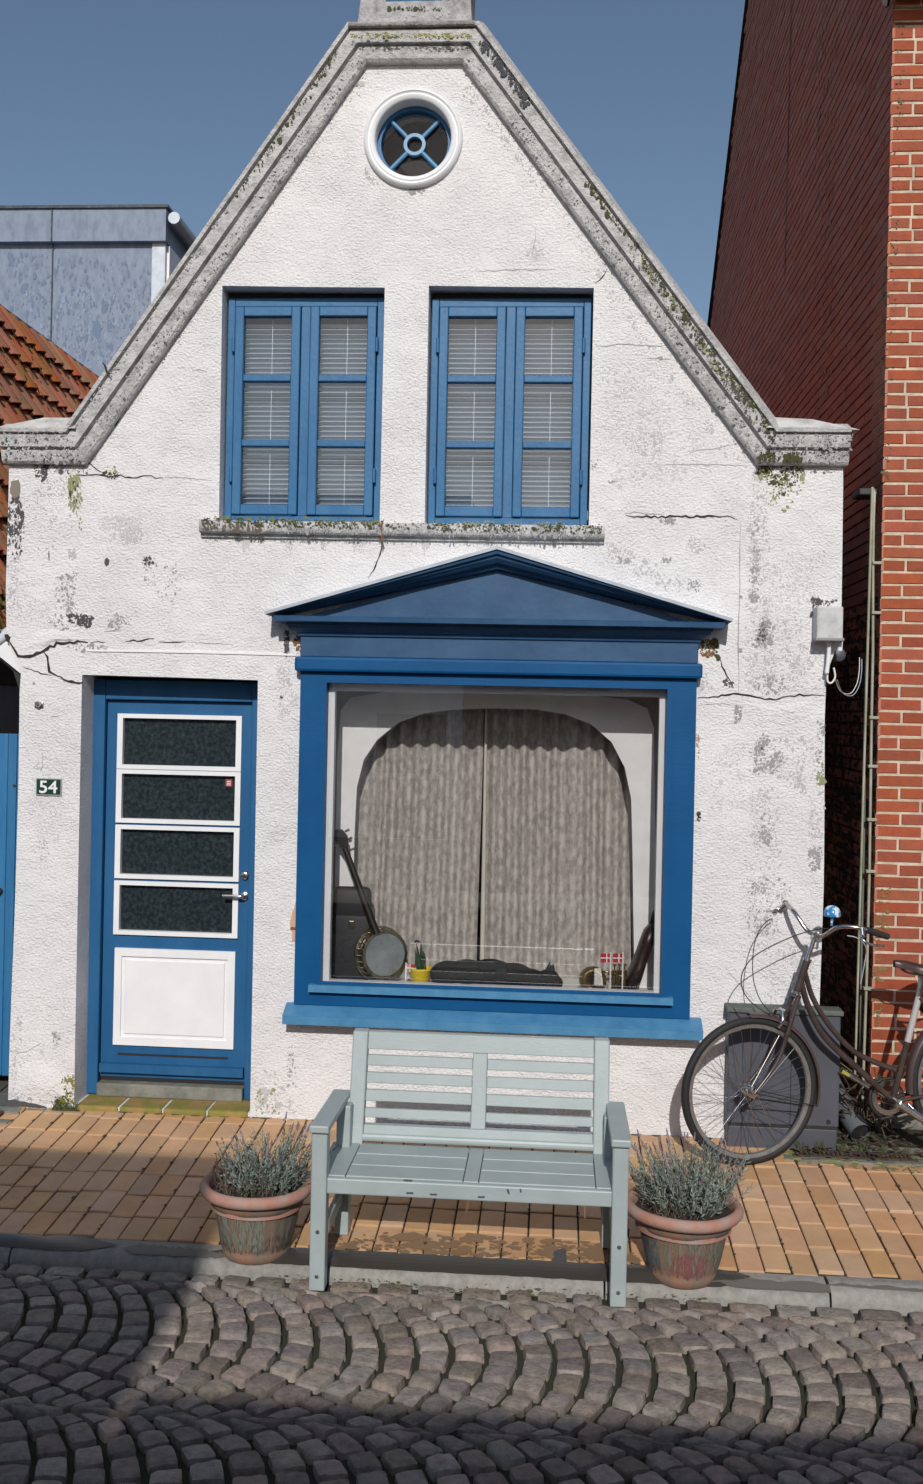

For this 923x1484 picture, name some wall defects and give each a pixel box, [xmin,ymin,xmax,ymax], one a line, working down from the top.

water stain [0,52,369,653]
crack [9,629,232,684]
crack [626,512,821,705]
mould [707,720,826,1005]